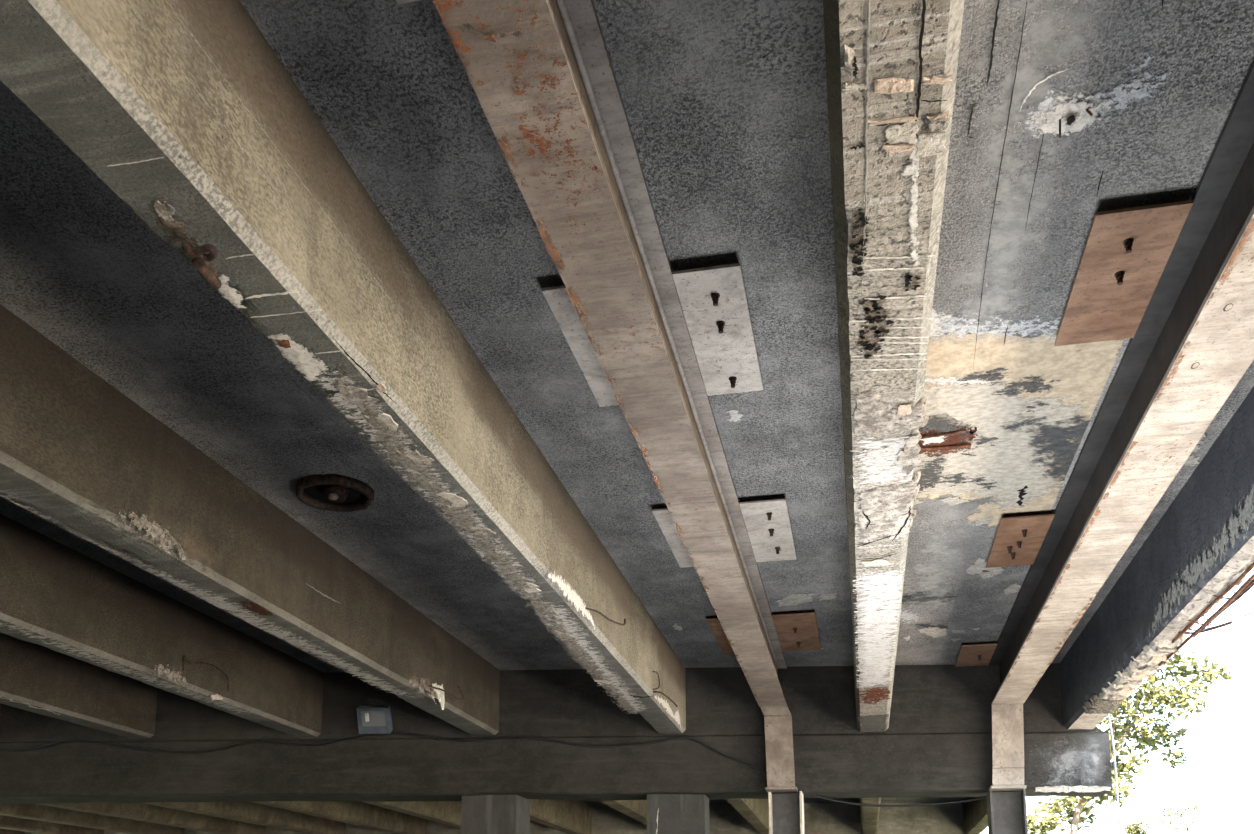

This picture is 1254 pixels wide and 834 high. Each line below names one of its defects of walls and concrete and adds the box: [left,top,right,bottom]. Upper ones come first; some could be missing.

spalling [153,200,299,310]
rust [434,0,609,269]
spalling [843,44,952,94]
spalling [867,111,951,158]
crack [914,0,1027,366]
spalling [1019,55,1167,138]
water stain [851,295,1089,485]
water stain [0,491,445,714]
spalling [267,333,641,714]
water stain [314,369,646,713]
rust [857,687,891,705]
spalling [1082,482,1254,714]